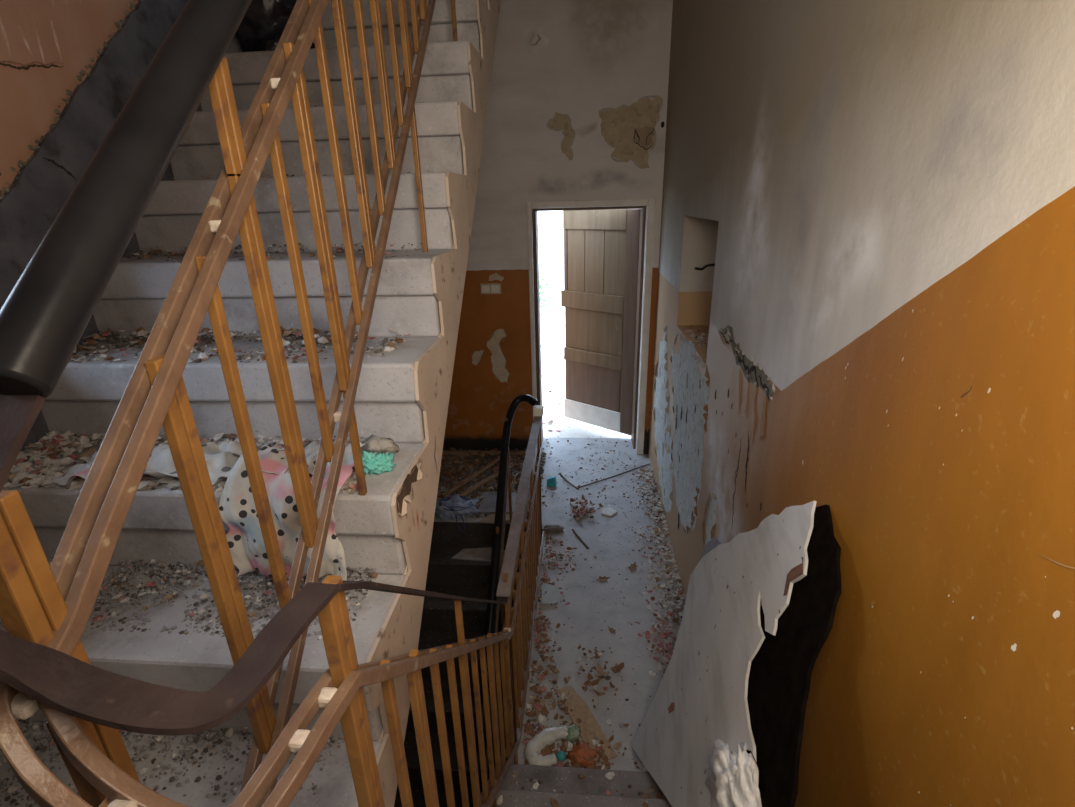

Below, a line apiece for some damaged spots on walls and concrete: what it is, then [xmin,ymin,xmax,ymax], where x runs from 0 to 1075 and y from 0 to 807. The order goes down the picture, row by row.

crack [0,60,64,70]
flaking render [546,112,576,161]
flaking render [599,95,664,169]
peeling [472,329,510,383]
flaking render [719,325,776,401]
peeling [653,326,717,544]
spalling [396,463,423,518]